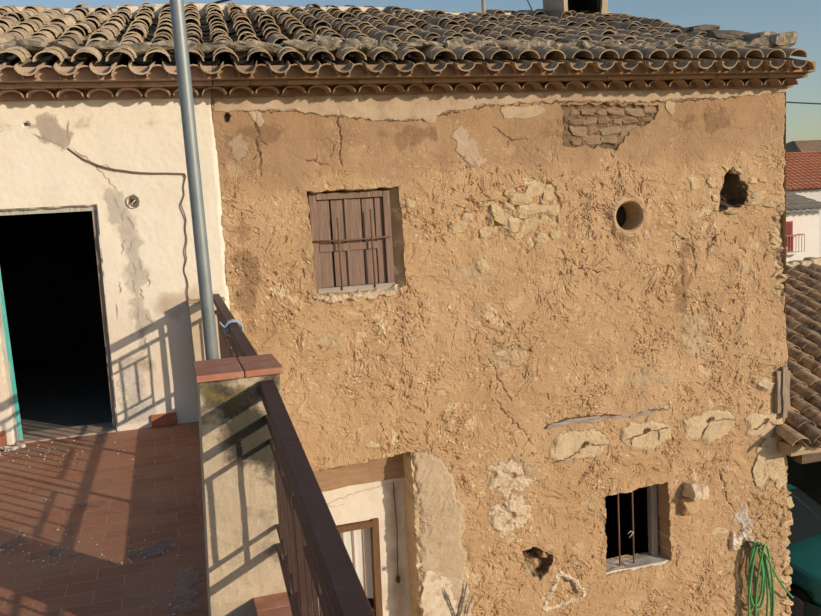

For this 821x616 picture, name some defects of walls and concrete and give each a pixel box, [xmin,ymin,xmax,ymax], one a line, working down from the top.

crack [253,123,266,169]
crack [307,117,342,165]
peeling [212,88,788,150]
crack [0,121,153,350]
spalling [705,165,788,298]
crack [327,483,390,508]
hole [522,547,553,581]